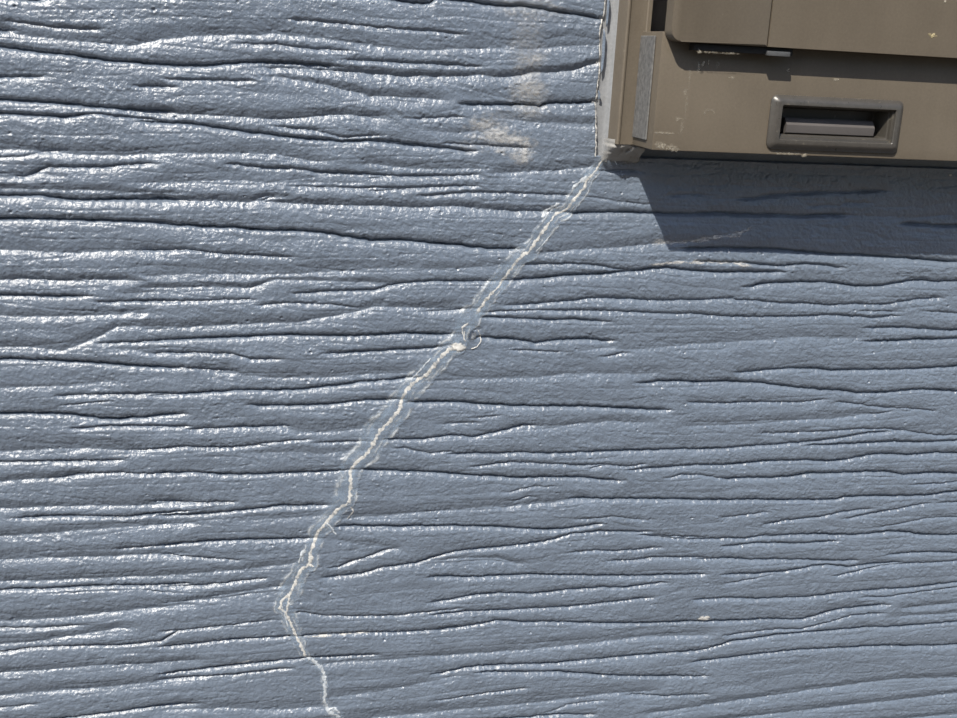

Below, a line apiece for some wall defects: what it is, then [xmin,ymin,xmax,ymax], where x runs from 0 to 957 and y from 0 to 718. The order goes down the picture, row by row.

crack [274,160,603,718]